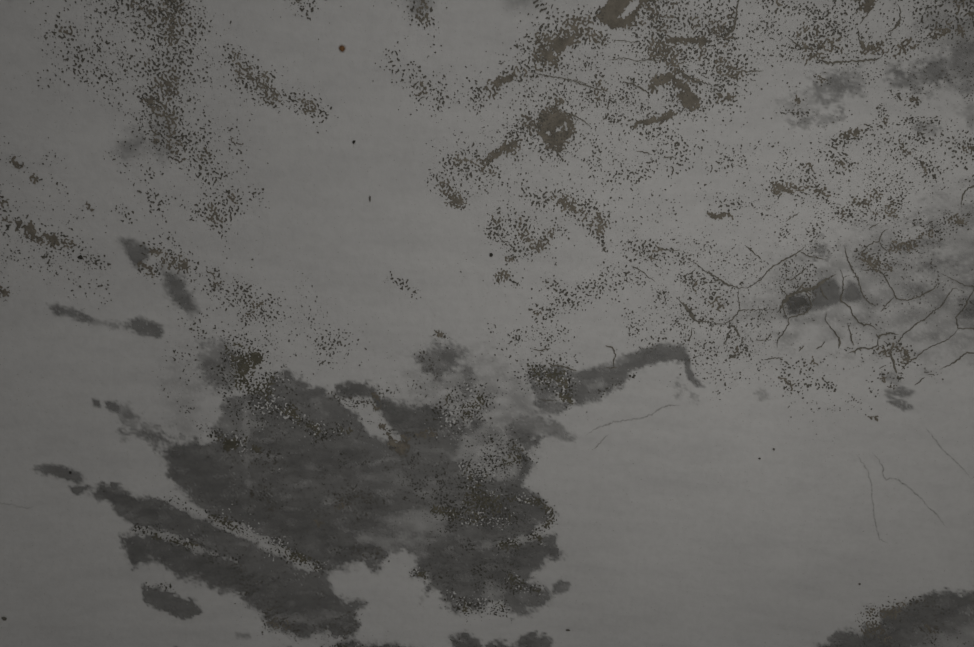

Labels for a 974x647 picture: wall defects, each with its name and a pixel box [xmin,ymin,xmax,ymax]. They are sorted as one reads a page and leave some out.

crack [727,0,740,35]
crack [788,7,881,65]
leakage [52,305,93,322]
crack [658,224,974,385]
leakage [787,280,860,314]
leakage [38,317,701,647]
leakage [820,588,974,647]